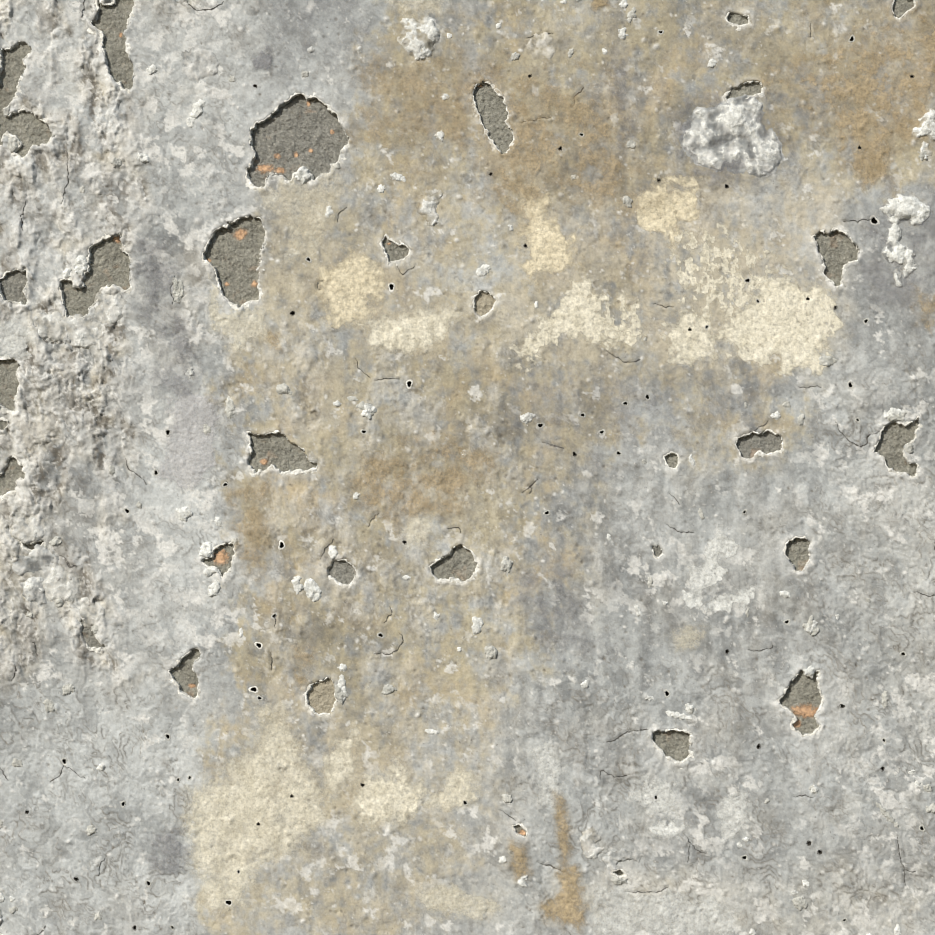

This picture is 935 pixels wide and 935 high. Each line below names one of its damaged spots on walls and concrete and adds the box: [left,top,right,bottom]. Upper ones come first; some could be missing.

spalling [87,0,136,95]
spalling [245,92,349,190]
spalling [470,81,515,154]
spalling [201,216,268,349]
peeling [637,175,863,375]
spalling [245,430,318,477]
spalling [872,416,923,484]
spalling [429,545,479,585]
spalling [776,670,824,737]